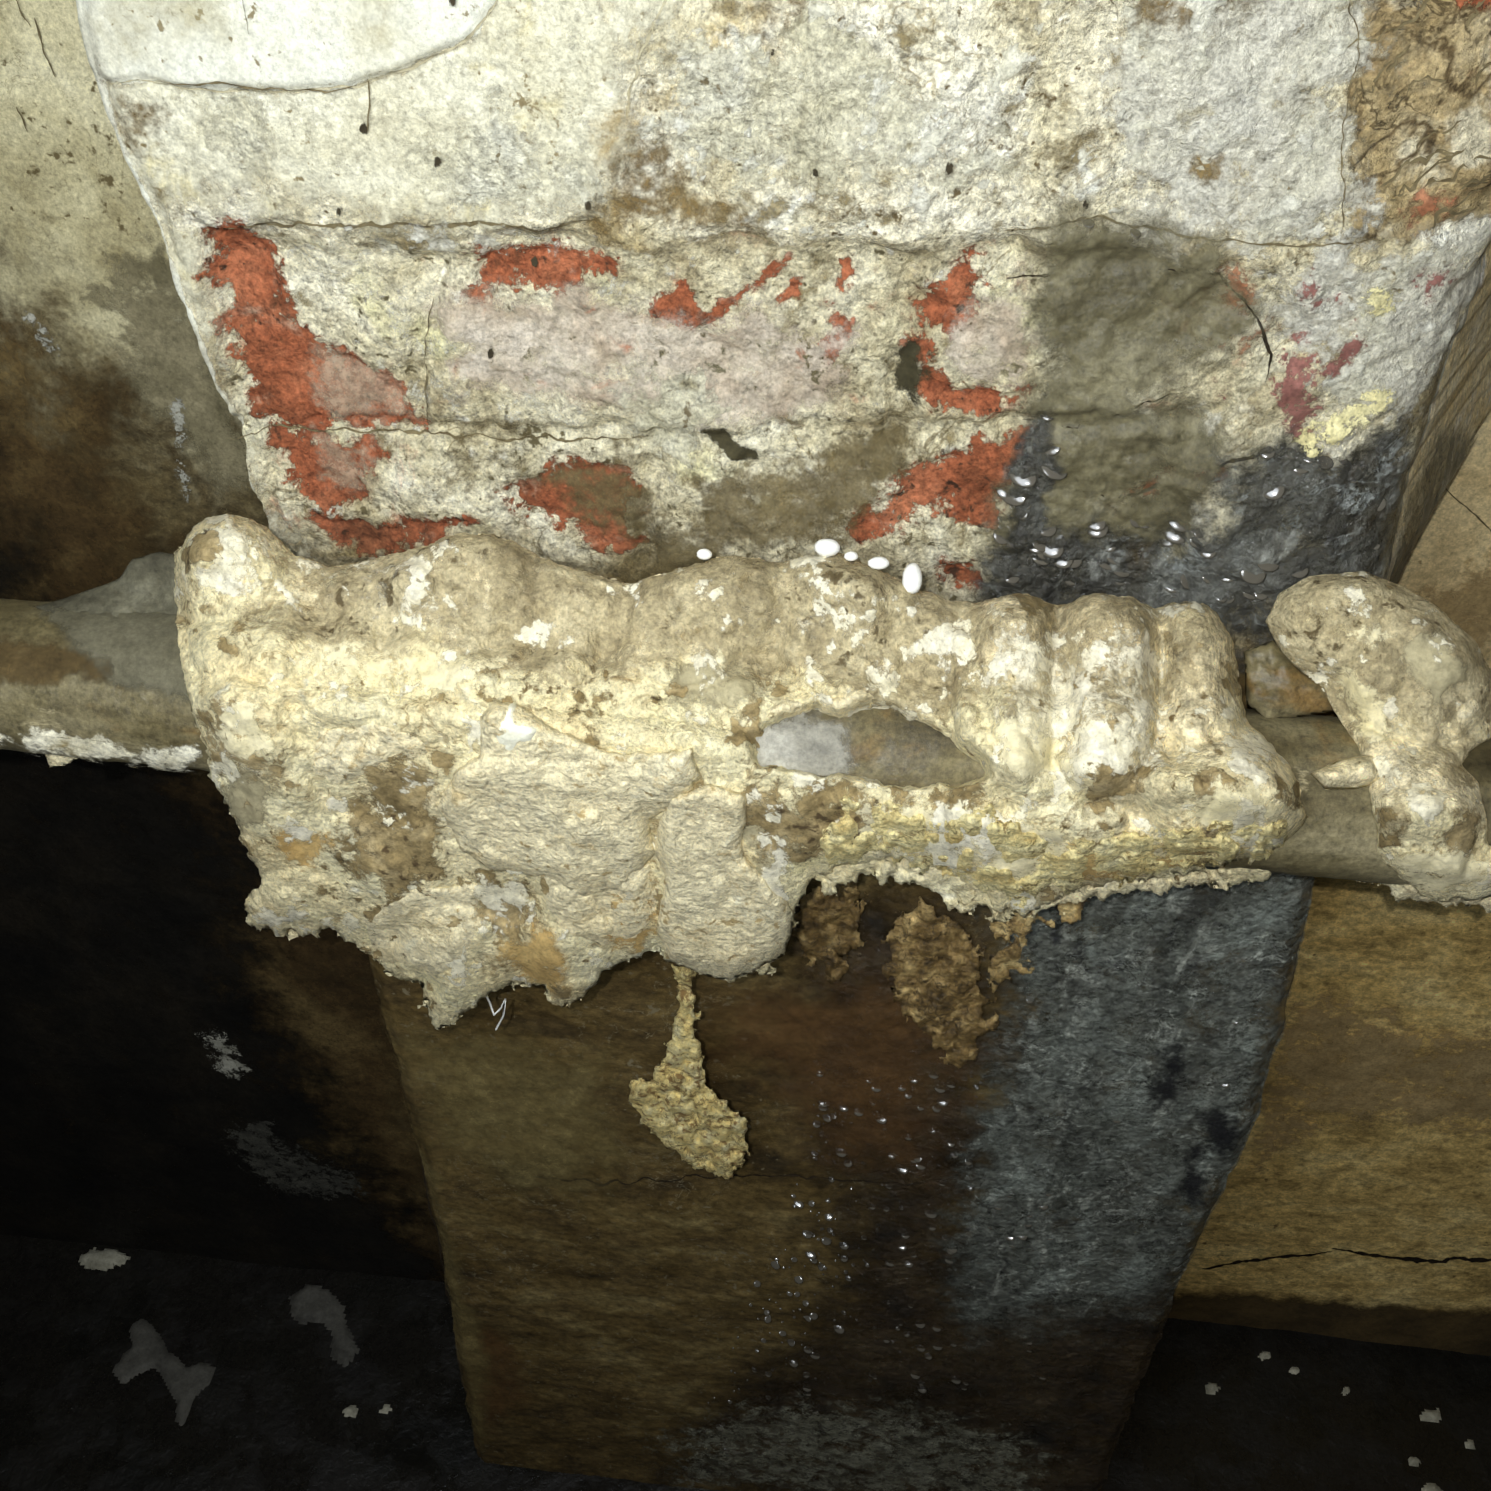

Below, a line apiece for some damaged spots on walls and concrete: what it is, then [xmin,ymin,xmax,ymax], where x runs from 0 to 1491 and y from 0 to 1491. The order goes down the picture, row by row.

leakage [115,102,156,150]
leakage [193,87,277,177]
leakage [1101,0,1385,260]
flaking render [106,0,1491,603]
leakage [0,236,249,602]
leakage [976,972,1011,996]
leakage [1262,994,1491,1131]
leakage [791,1194,815,1212]
leakage [771,1251,827,1275]
crack [1202,1248,1491,1270]
leakage [787,1291,824,1322]